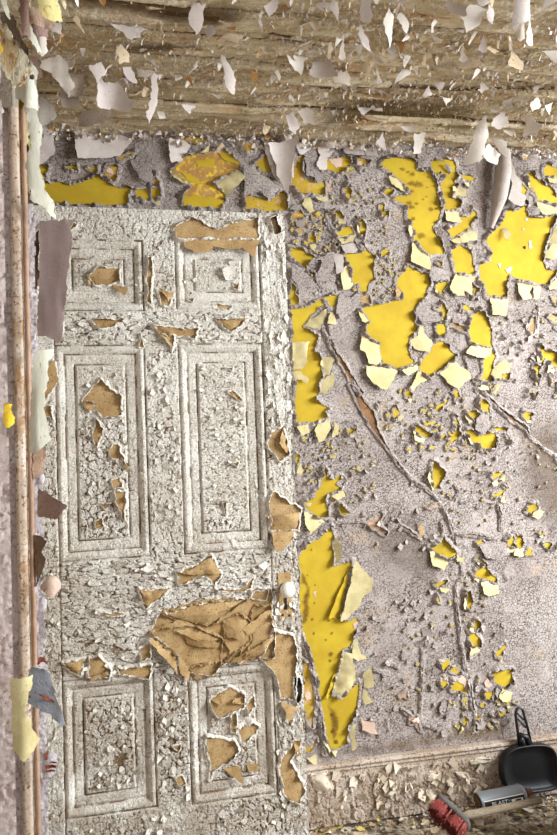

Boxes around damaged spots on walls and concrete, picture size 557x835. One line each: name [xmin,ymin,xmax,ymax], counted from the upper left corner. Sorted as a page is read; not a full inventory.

peeling [358,0,379,52]
peeling [396,12,409,34]
peeling [442,0,494,33]
peeling [508,50,524,71]
peeling [422,81,451,105]
peeling [523,97,553,137]
peeling [3,403,15,428]
peeling [44,360,59,424]
crack [462,354,557,466]
peeling [55,107,557,825]
crack [289,215,503,735]
peeling [10,674,62,762]